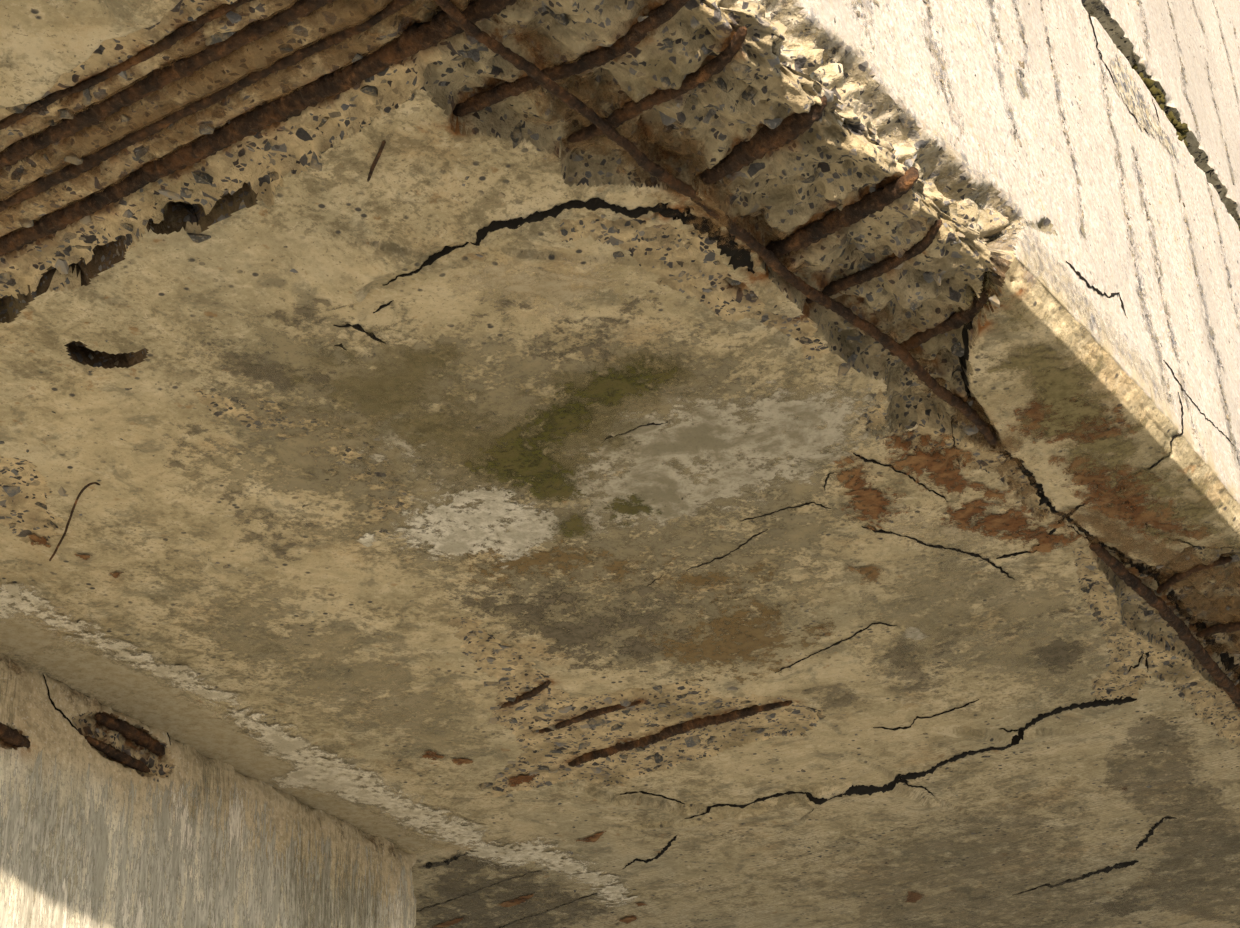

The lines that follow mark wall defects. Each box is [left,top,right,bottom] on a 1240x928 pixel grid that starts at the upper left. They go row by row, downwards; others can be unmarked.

rust [0,0,470,230]
rust [507,24,788,271]
spalling [0,0,1058,543]
crack [333,198,755,351]
crack [1066,261,1126,315]
water stain [163,258,909,684]
rust [833,349,1240,679]
water stain [957,272,1240,557]
spalling [72,711,176,782]
crack [620,651,1150,869]
crack [1014,816,1177,895]
spalling [1064,521,1240,769]